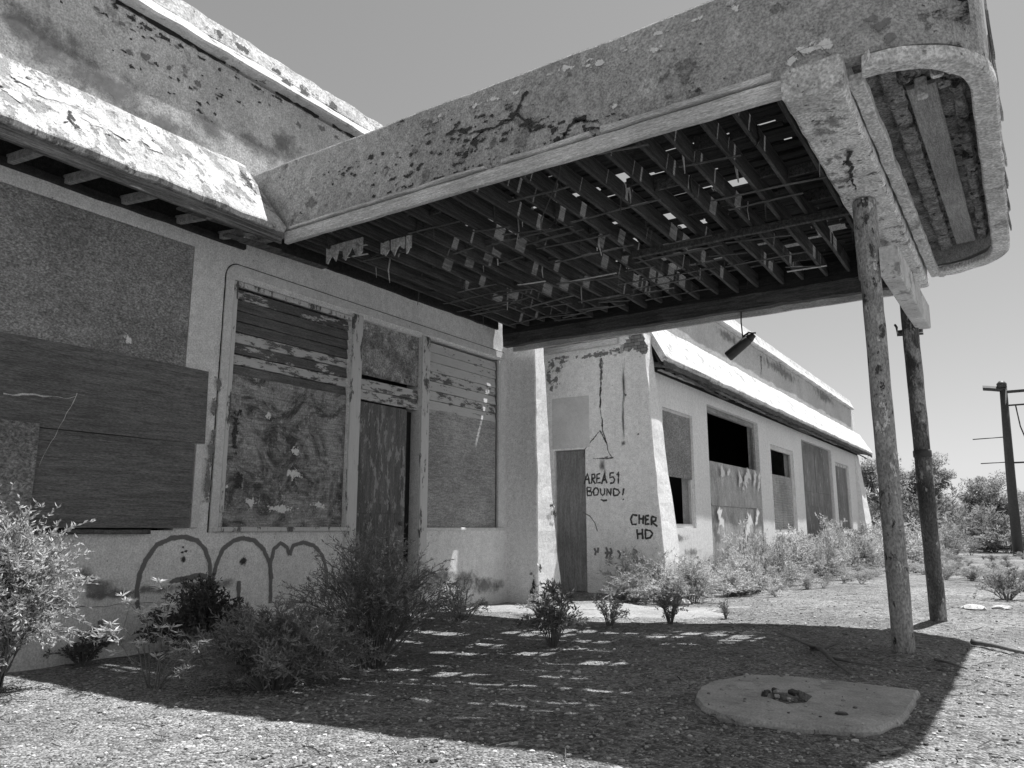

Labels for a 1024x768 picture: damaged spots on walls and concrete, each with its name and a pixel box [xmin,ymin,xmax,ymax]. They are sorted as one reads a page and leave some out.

peeling [0,75,164,154]
spalling [93,3,244,123]
peeling [271,68,311,98]
spalling [324,90,569,198]
crack [465,90,601,158]
peeling [538,58,605,85]
crack [843,150,857,190]
spalling [546,334,648,392]
crack [583,358,625,459]